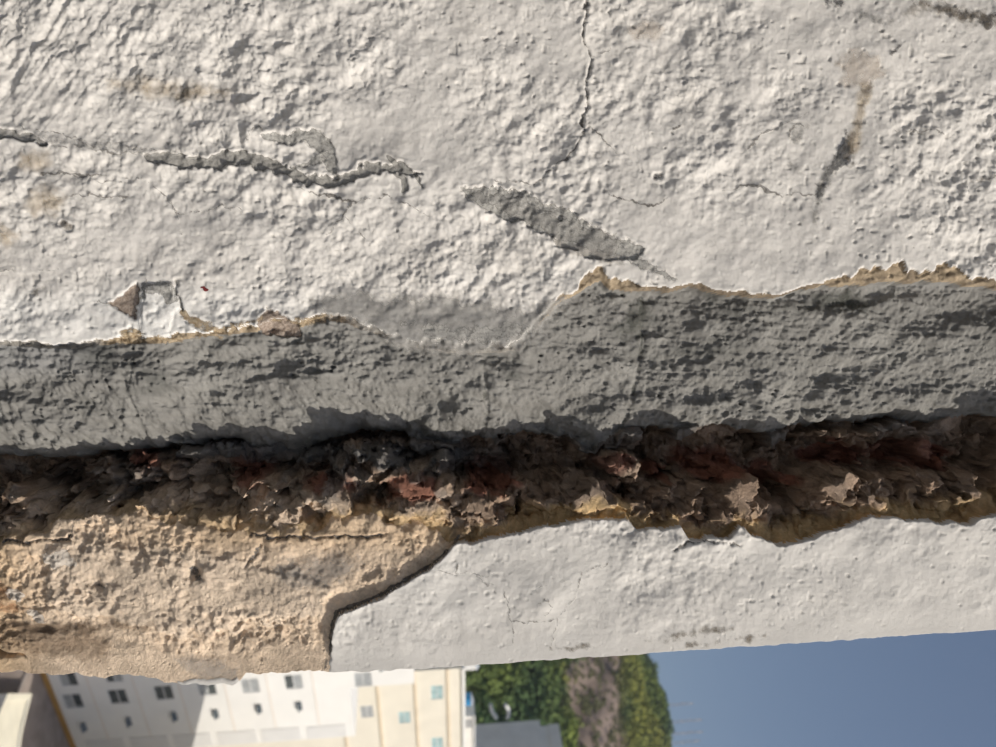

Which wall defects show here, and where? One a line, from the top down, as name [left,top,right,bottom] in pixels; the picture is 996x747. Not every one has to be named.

peeling [0,126,423,193]
crack [540,0,611,181]
water stain [815,130,856,198]
spalling [0,180,996,683]